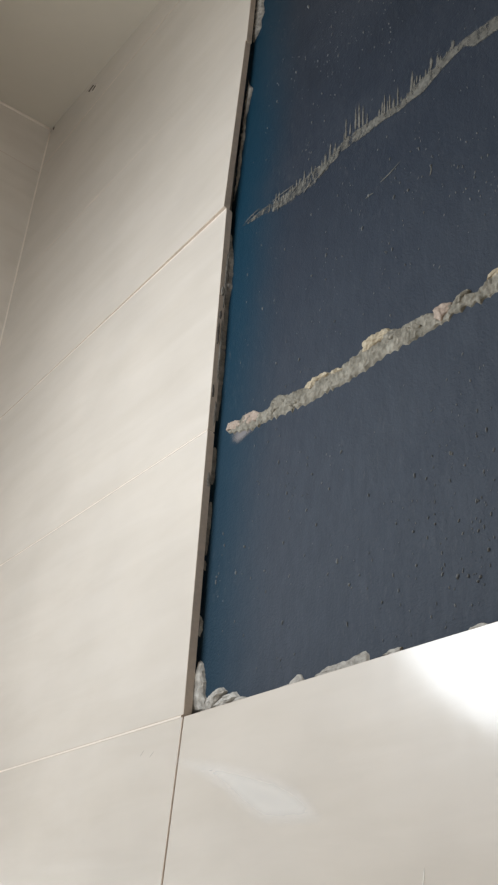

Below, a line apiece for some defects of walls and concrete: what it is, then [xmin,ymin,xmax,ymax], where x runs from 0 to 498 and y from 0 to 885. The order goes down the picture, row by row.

peeling [192,0,498,714]